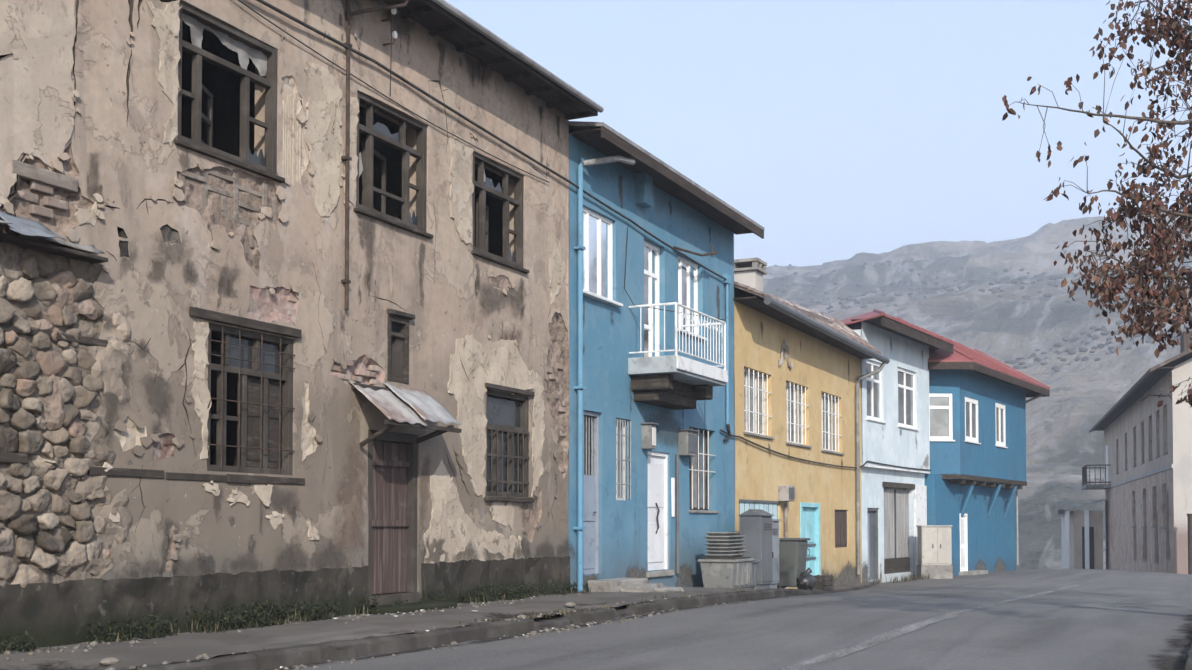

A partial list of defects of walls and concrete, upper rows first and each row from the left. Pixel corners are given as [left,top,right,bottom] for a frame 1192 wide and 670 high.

crack [69,0,79,139]
crack [125,0,176,120]
flaking render [0,0,81,214]
flaking render [74,193,105,226]
hole [159,224,181,244]
peeling [258,177,291,222]
damp [475,268,524,339]
crack [130,330,196,454]
flaking render [202,480,285,530]
flaking render [307,521,319,540]
crack [446,446,469,494]
flaking render [423,334,549,563]